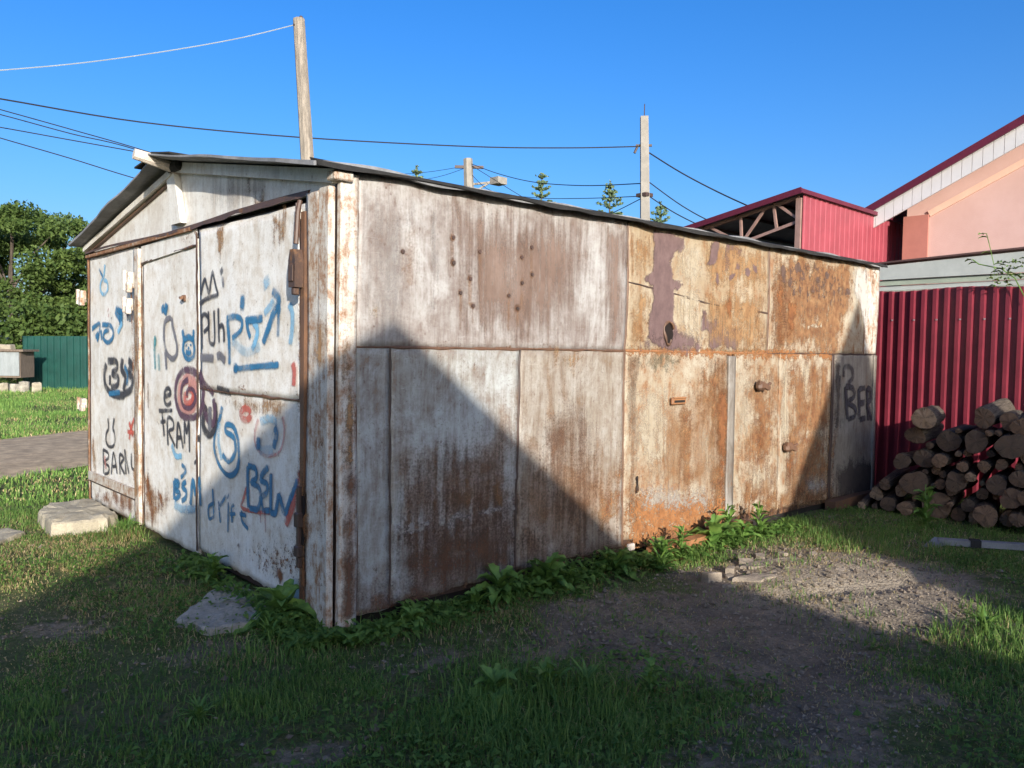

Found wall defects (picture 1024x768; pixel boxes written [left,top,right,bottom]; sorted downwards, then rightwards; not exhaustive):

corrosion [314,322,327,366]
corrosion [342,344,516,620]
corrosion [450,211,587,338]
corrosion [528,223,853,561]